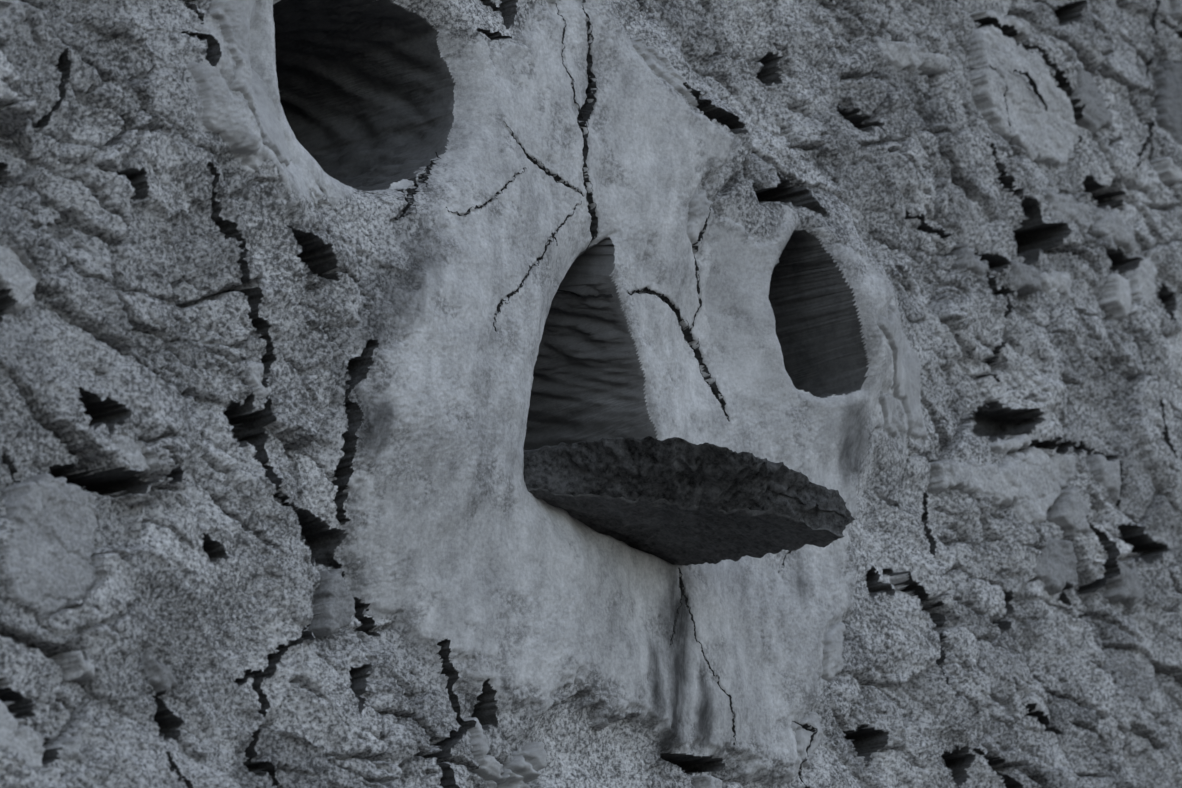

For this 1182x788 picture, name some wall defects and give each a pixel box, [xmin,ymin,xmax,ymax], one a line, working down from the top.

crack [389,0,598,334]
crack [558,205,729,421]
crack [328,339,379,525]
crack [234,613,322,788]
crack [326,553,381,637]
crack [421,639,476,788]
crack [669,568,736,749]